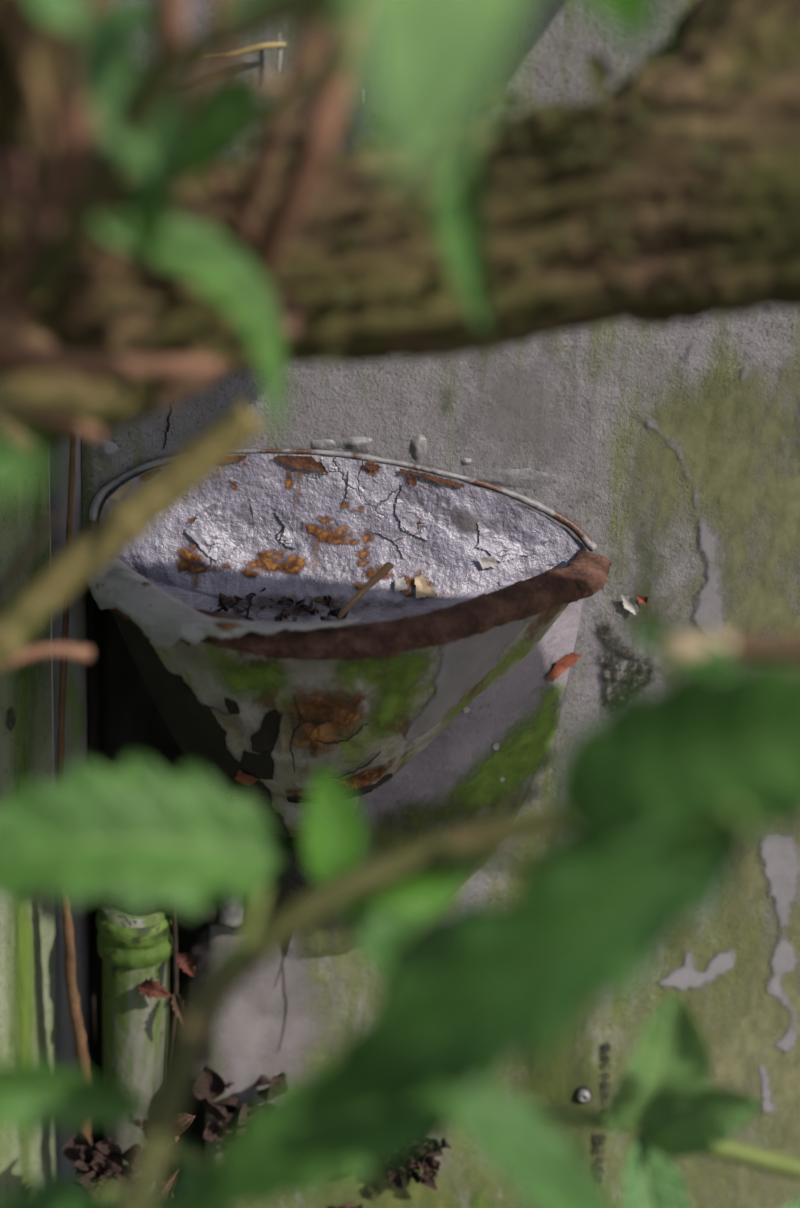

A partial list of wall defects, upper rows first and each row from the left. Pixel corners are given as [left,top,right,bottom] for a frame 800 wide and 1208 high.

corrosion [285,471,300,495]
corrosion [177,502,433,597]